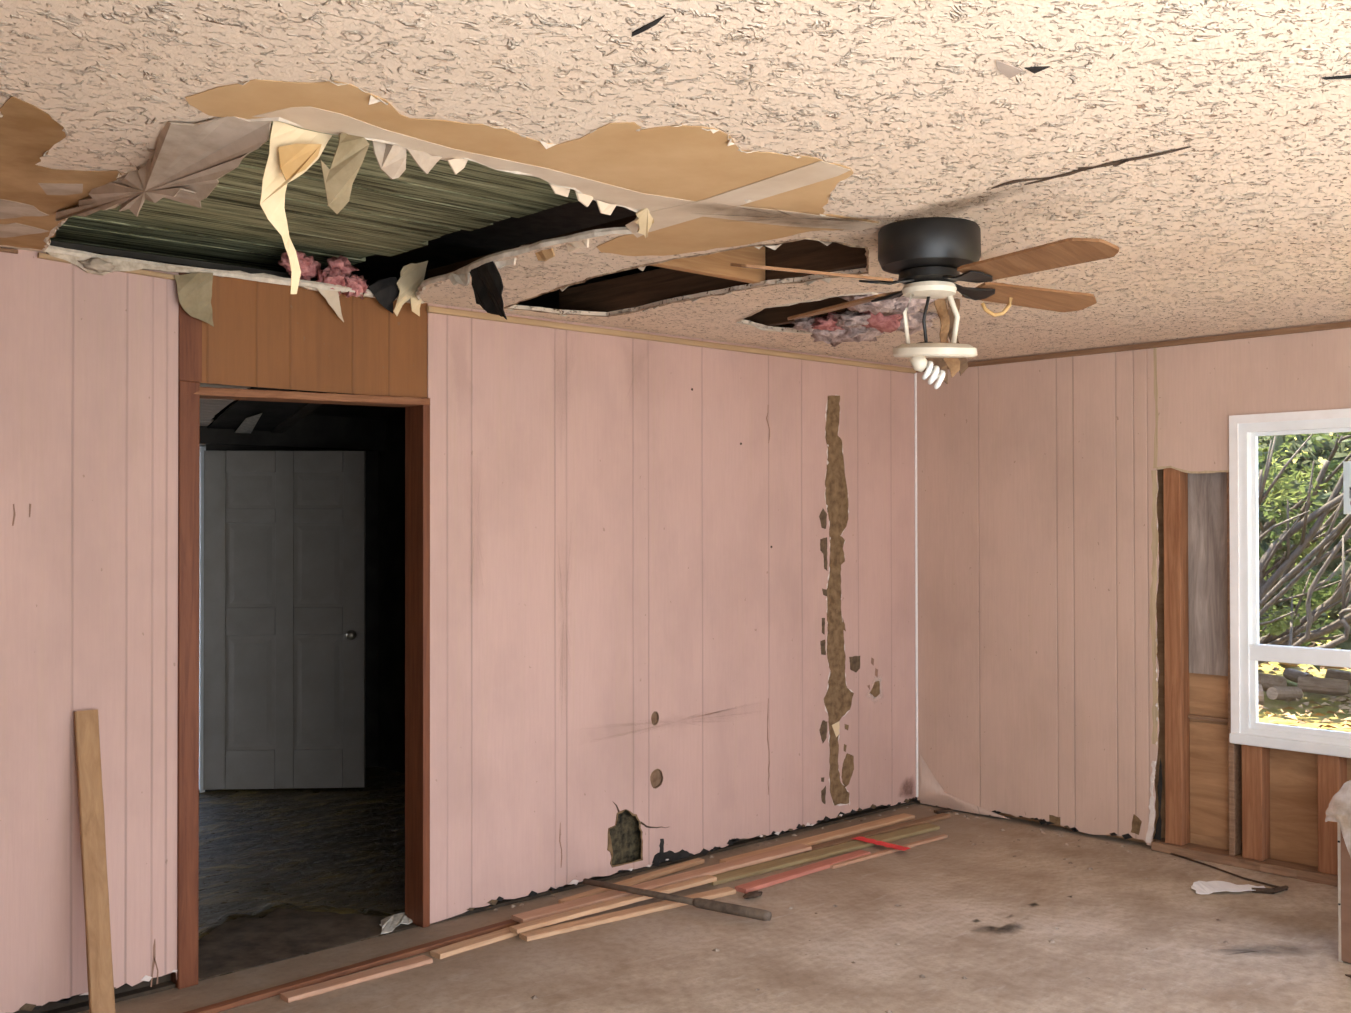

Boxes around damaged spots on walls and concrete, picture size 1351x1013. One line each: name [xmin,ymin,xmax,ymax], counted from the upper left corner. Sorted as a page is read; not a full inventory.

peeling [324,78,388,105]
peeling [447,158,468,174]
crack [991,146,1191,189]
peeling [38,183,83,195]
peeling [548,182,617,215]
peeling [0,199,59,242]
peeling [494,239,589,269]
peeling [448,270,471,286]
peeling [758,395,918,838]
spalling [607,802,739,873]
spalling [529,876,598,896]